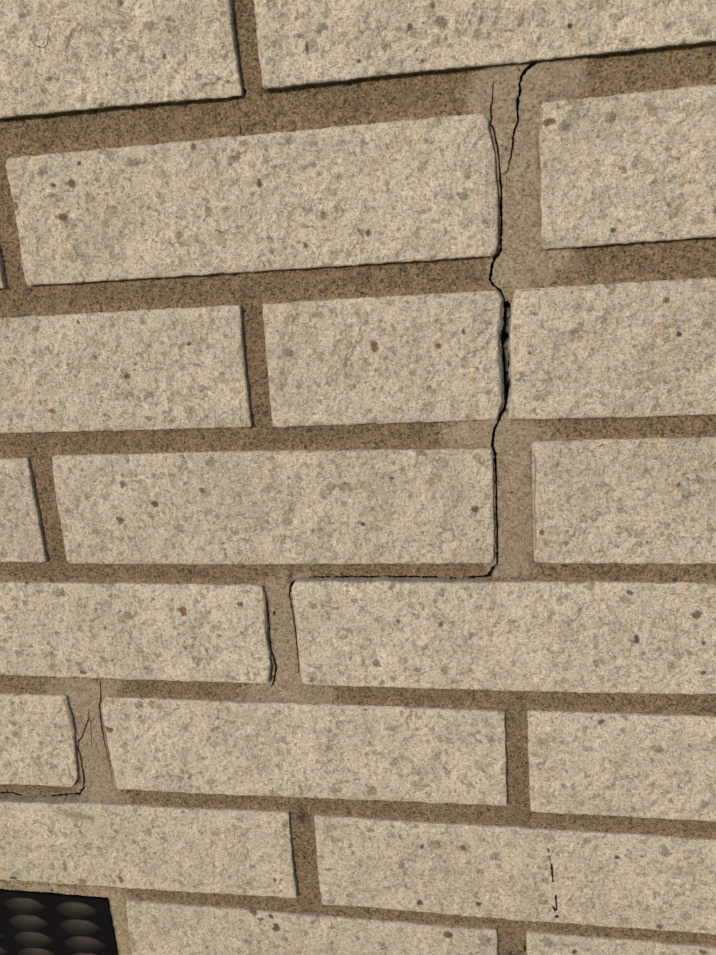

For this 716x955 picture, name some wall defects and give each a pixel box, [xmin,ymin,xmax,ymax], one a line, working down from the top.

crack [273,64,531,682]
crack [0,786,85,797]